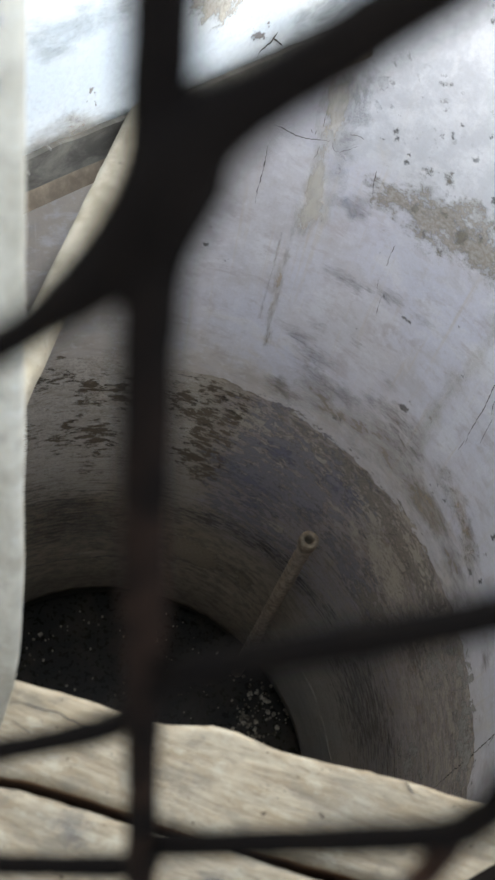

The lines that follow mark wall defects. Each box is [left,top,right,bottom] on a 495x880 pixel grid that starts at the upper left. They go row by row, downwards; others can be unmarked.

crack [459,385,495,448]